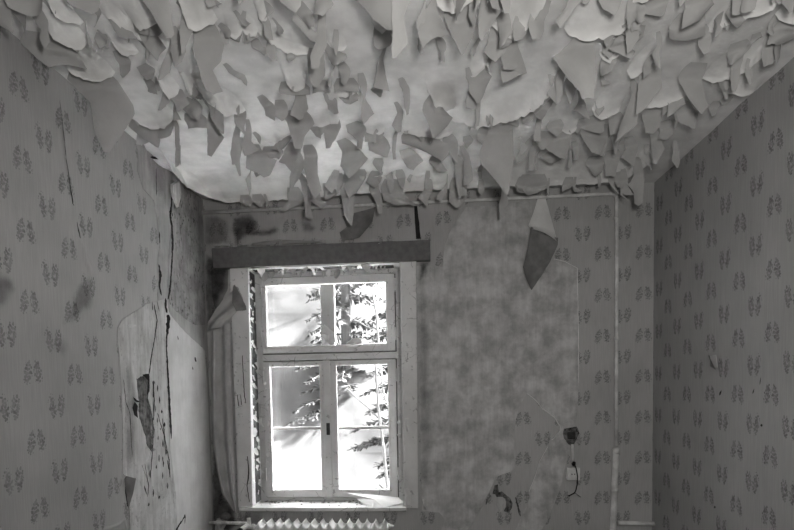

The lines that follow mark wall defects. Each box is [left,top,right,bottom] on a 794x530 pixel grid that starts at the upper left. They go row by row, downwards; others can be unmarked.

spalling [133,374,168,489]
crack [144,173,179,497]
peeling [0,0,794,347]
spalling [486,484,521,516]